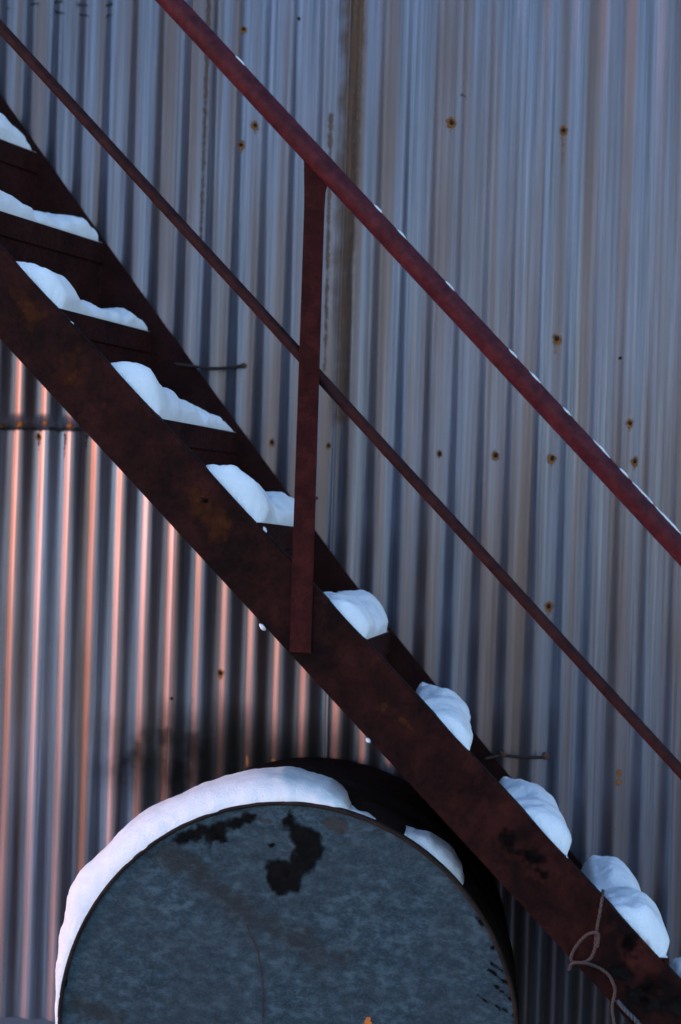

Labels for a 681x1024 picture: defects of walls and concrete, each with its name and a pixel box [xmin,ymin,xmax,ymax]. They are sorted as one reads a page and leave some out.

corrosion [328,0,363,185]
corrosion [324,189,354,391]